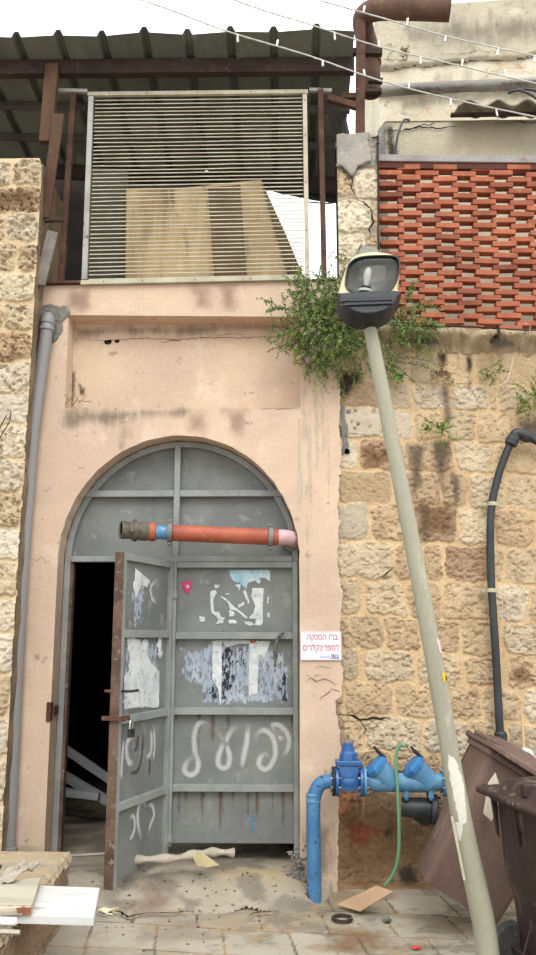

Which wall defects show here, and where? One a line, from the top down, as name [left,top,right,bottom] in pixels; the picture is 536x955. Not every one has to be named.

flaking render [335,132,372,177]
crack [82,334,281,343]
crack [307,666,388,736]
spalling [338,789,354,815]